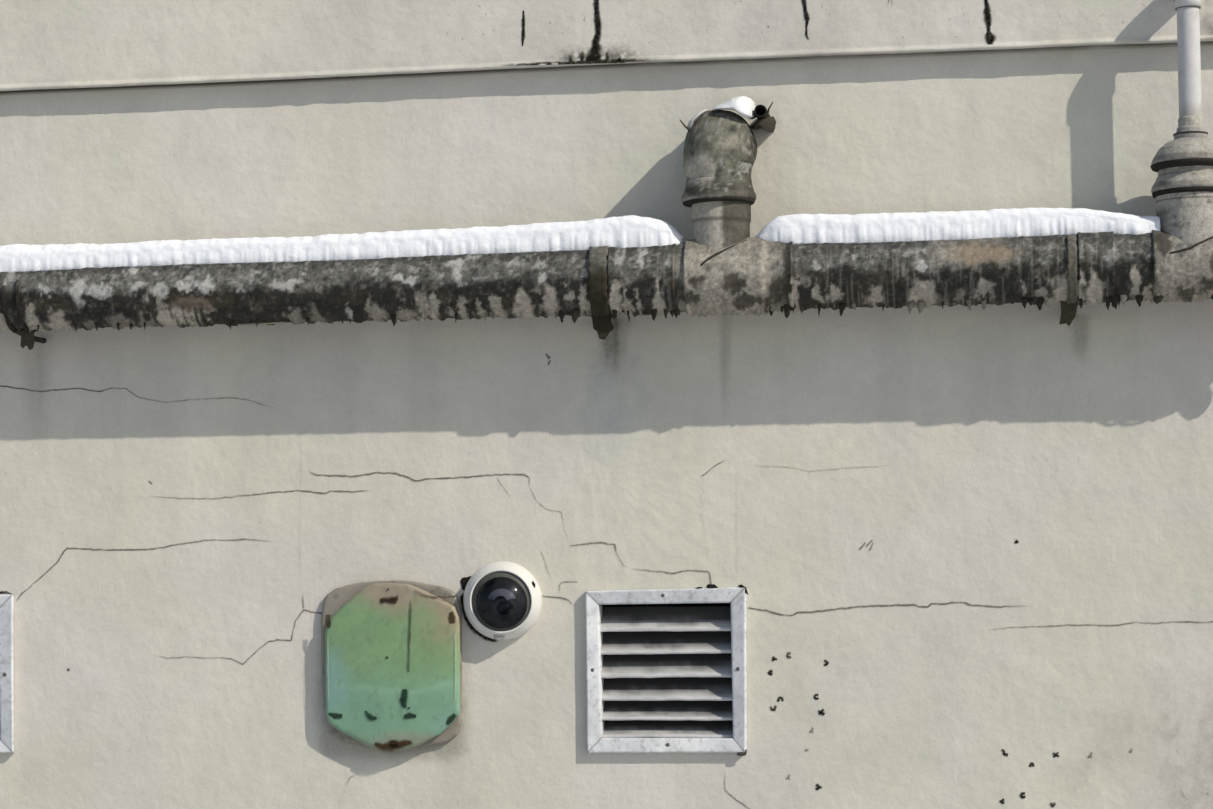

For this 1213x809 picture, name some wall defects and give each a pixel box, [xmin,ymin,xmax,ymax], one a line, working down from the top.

crack [589,0,601,61]
crack [802,0,810,39]
crack [984,0,995,44]
crack [0,384,128,392]
crack [193,472,530,499]
crack [575,542,616,550]
crack [0,539,249,596]
crack [658,570,712,584]
crack [748,602,1010,616]
crack [227,601,322,665]
crack [1039,620,1213,628]